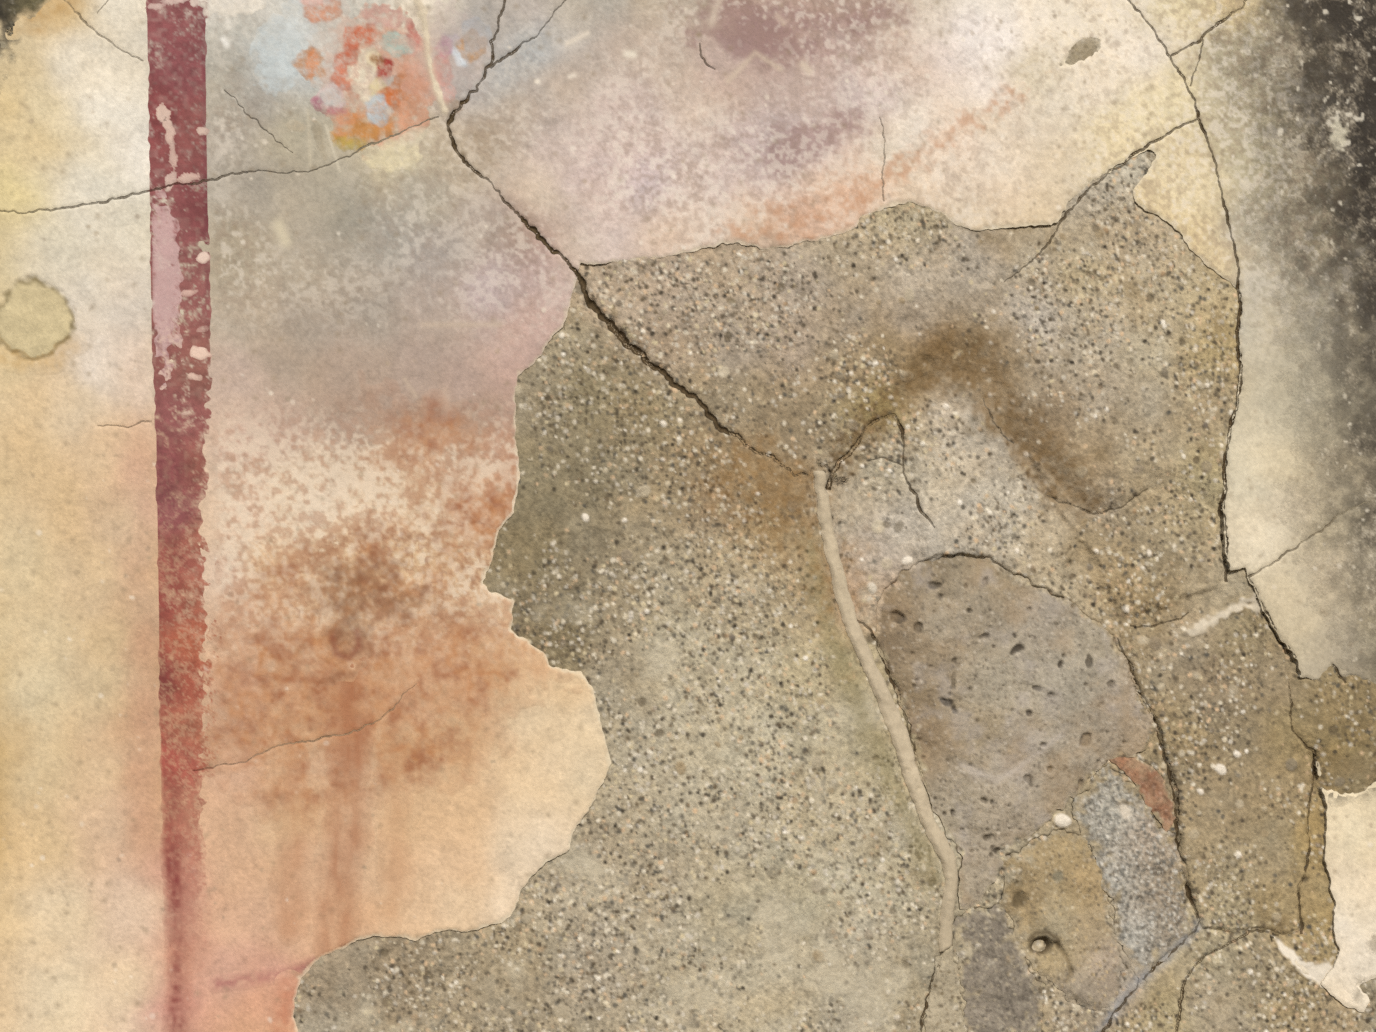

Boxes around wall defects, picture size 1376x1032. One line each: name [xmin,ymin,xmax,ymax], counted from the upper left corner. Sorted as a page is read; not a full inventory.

water stain [5,0,87,40]
crack [0,0,935,528]
water stain [483,309,1112,685]
spalling [293,150,1376,1032]
crack [857,619,932,796]
crack [982,398,1014,444]
crack [1004,0,1371,1032]
crack [920,952,943,1032]